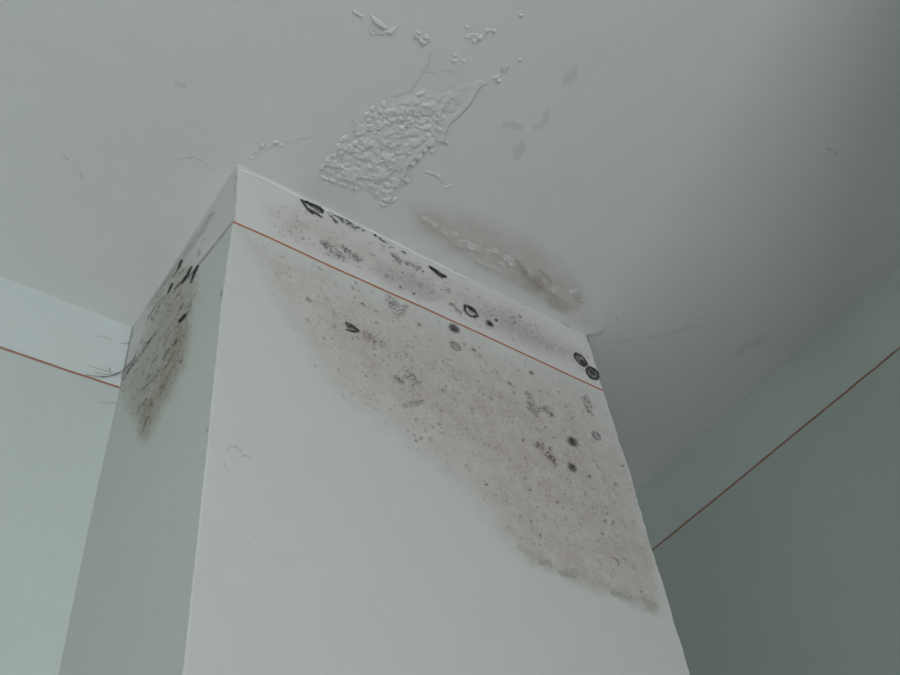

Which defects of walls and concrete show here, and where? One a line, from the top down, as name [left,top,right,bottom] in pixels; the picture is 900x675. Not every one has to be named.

leakage [301,199,406,260]
leakage [168,260,199,292]
leakage [574,352,600,380]